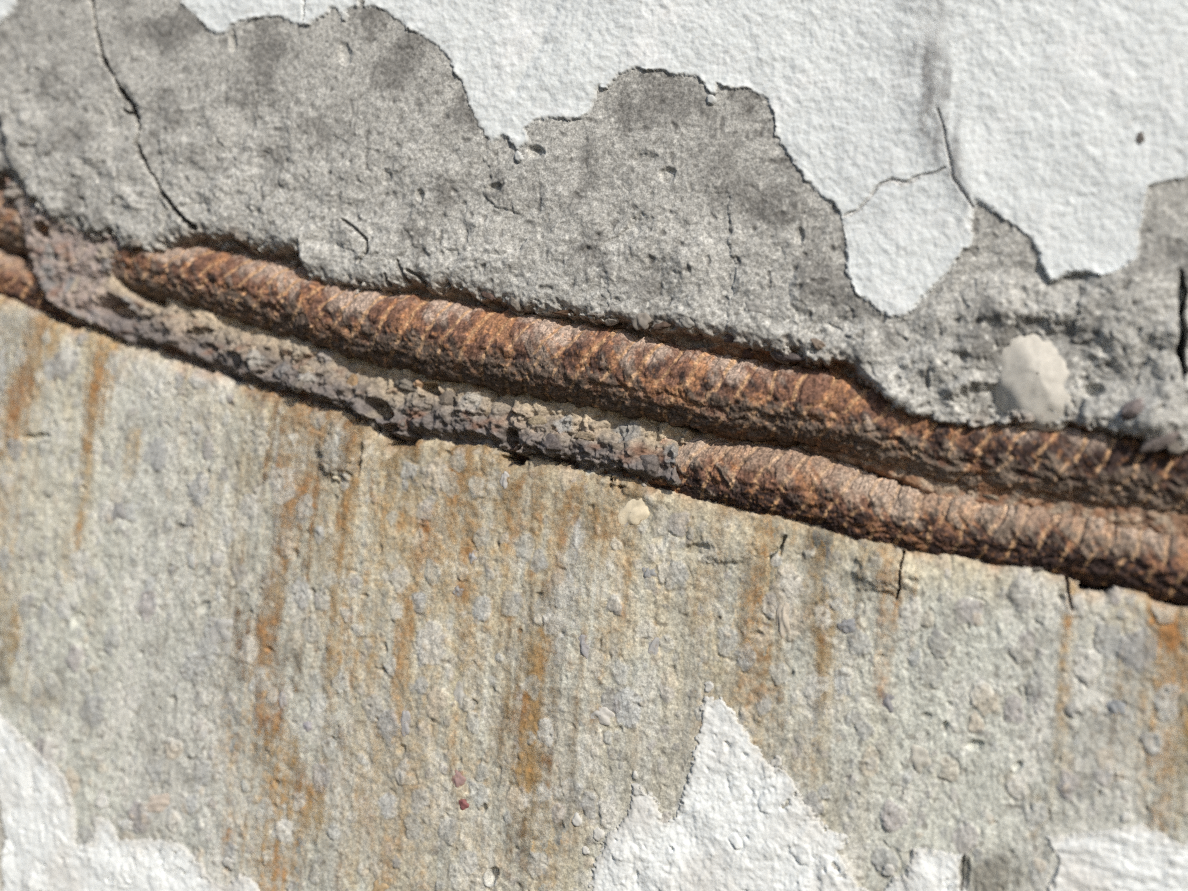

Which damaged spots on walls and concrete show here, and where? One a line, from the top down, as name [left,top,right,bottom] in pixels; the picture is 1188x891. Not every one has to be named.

crack [92,0,198,231]
crack [842,109,975,218]
corrosion [6,318,63,438]
corrosion [84,332,120,475]
peeling [0,0,1188,607]
crack [1175,270,1188,375]
corrosion [380,440,428,562]
corrosion [260,829,299,891]